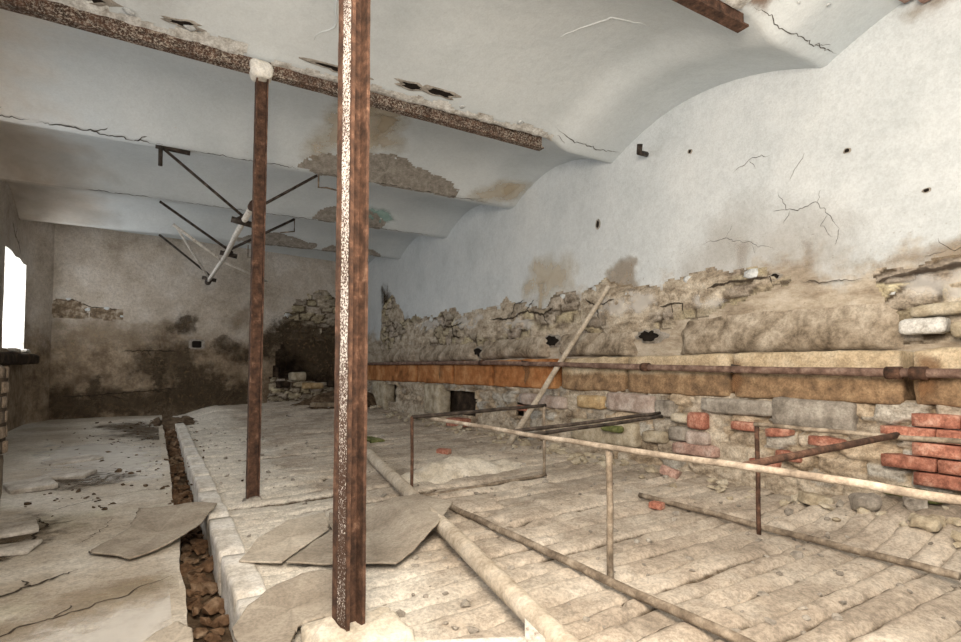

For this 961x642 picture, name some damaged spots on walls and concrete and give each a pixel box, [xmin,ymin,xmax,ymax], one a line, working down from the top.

spalling [48,0,248,55]
crack [762,10,837,54]
crack [0,115,163,145]
spalling [369,153,460,198]
water stain [155,315,197,333]
water stain [213,336,249,361]
water stain [263,312,335,388]
flaking render [380,261,791,358]
flaking render [873,243,961,345]
water stain [49,345,248,420]
crack [0,569,78,597]
crack [0,575,172,637]